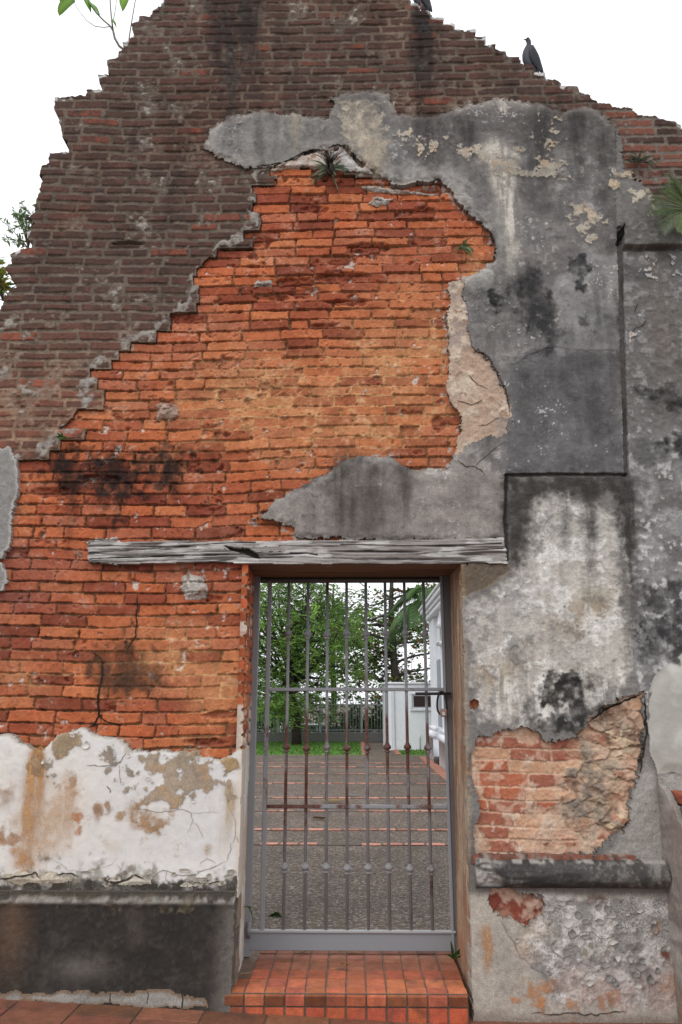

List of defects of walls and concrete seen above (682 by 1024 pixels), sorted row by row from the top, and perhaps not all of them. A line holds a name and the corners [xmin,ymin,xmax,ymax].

peeling [396,113,573,188]
damp [462,119,554,356]
peeling [608,168,666,216]
damp [47,442,210,525]
spalling [0,147,512,808]
damp [501,473,682,664]
crack [126,596,138,652]
crack [89,652,120,727]
damp [538,669,607,738]
crack [0,753,238,885]
spalling [471,691,645,854]
peeling [488,888,661,989]